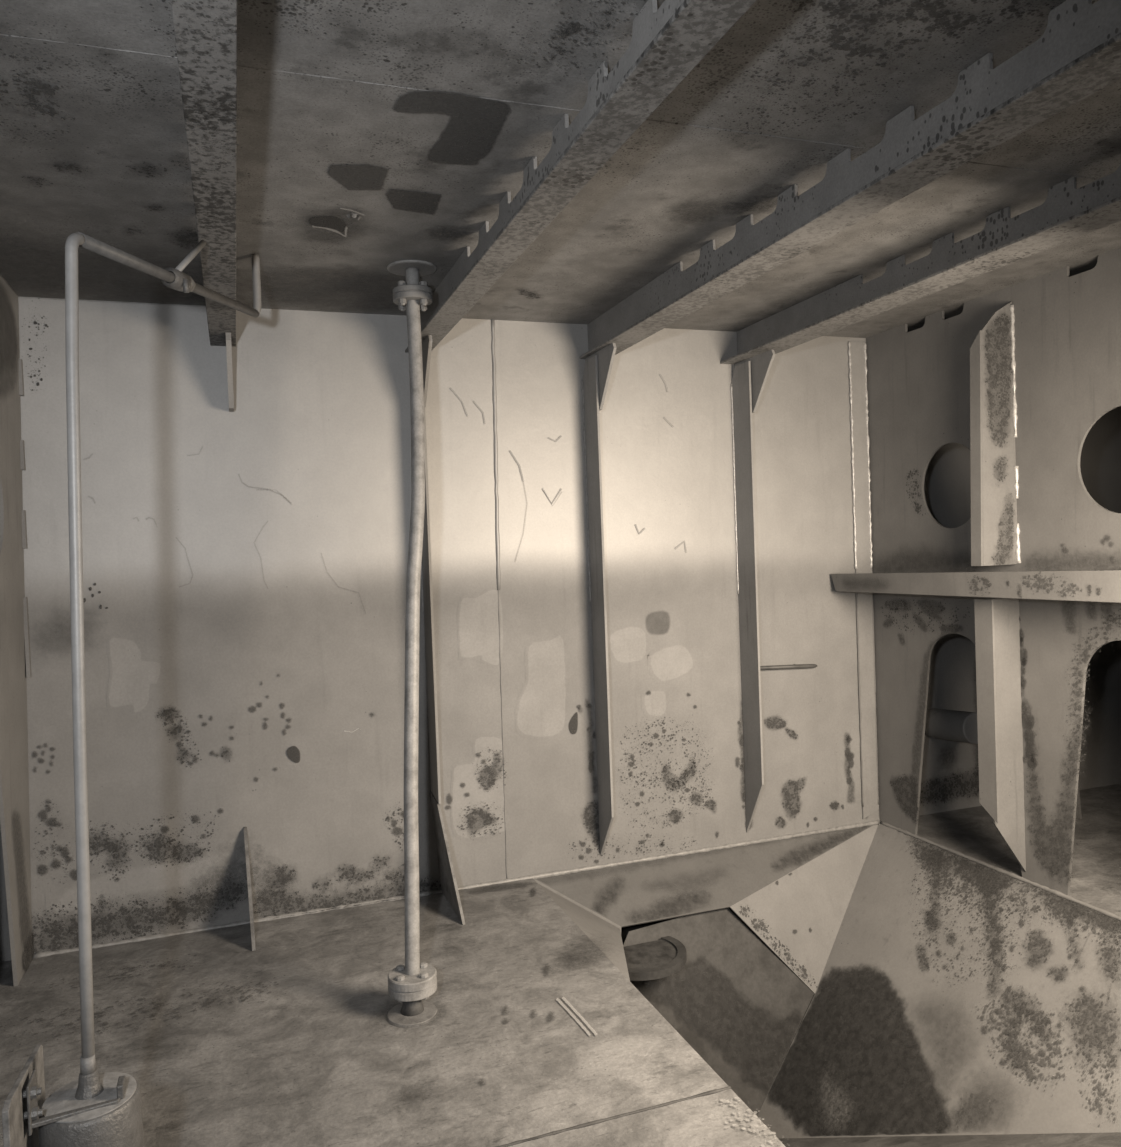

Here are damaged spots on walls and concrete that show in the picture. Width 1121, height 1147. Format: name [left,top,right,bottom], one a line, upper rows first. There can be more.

corrosion [0,49,83,142]
spalling [309,208,365,241]
corrosion [984,313,1013,486]
corrosion [991,493,1015,565]
corrosion [157,707,234,768]
corrosion [568,713,716,863]
corrosion [830,735,854,810]
corrosion [14,799,405,971]
corrosion [419,876,441,892]
corrosion [878,571,1121,1126]